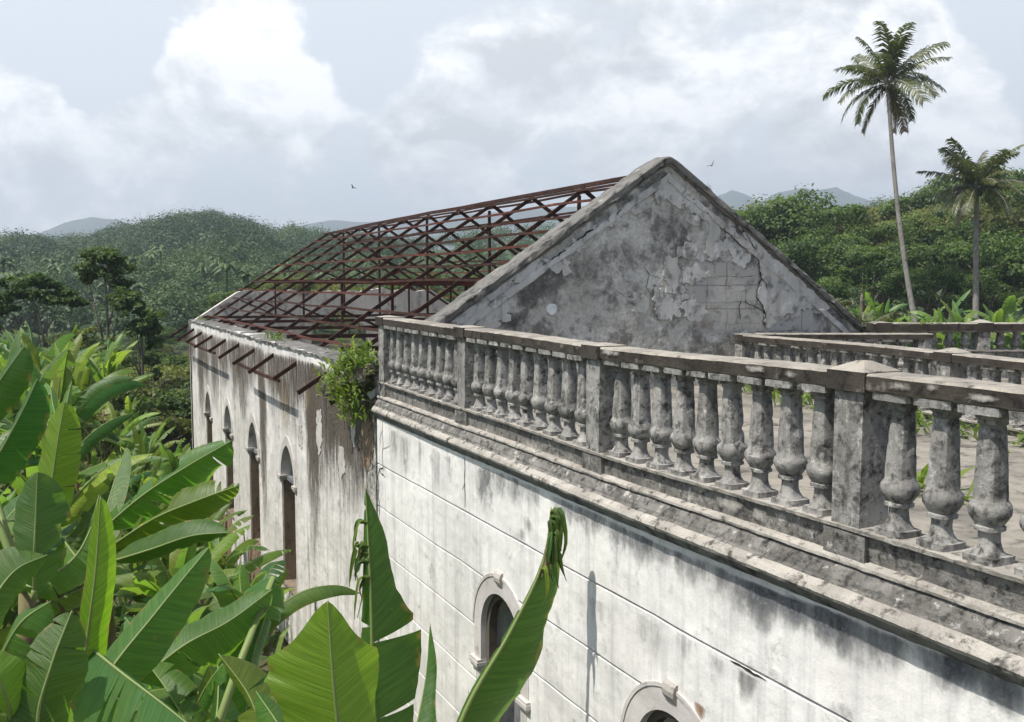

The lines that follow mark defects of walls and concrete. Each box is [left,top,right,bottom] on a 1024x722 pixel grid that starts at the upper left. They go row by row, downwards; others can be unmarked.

spalling [452,182,830,334]
crack [693,199,767,326]
leakage [188,328,374,527]
leakage [630,534,652,551]